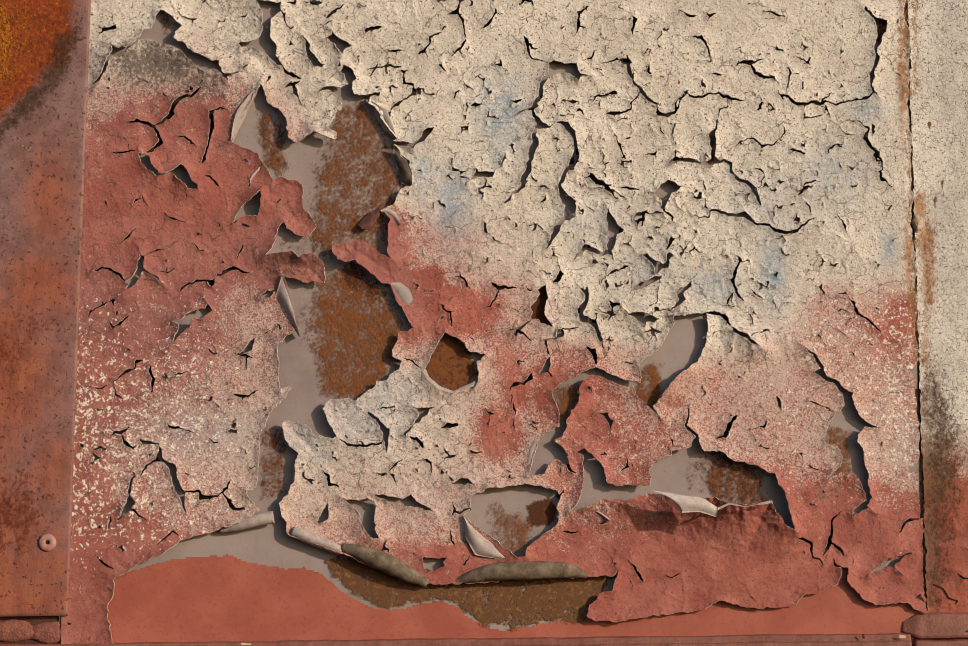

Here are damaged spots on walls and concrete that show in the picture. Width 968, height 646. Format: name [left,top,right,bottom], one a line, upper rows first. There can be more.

peeling [93,10,248,84]
peeling [239,0,286,65]
crack [282,0,508,109]
peeling [864,7,887,94]
rust [875,18,886,44]
rust [281,99,403,399]
peeling [107,32,922,643]
crack [485,6,928,613]
crack [108,422,256,546]
crack [339,402,432,473]
rust [908,281,966,607]
rust [325,555,614,632]